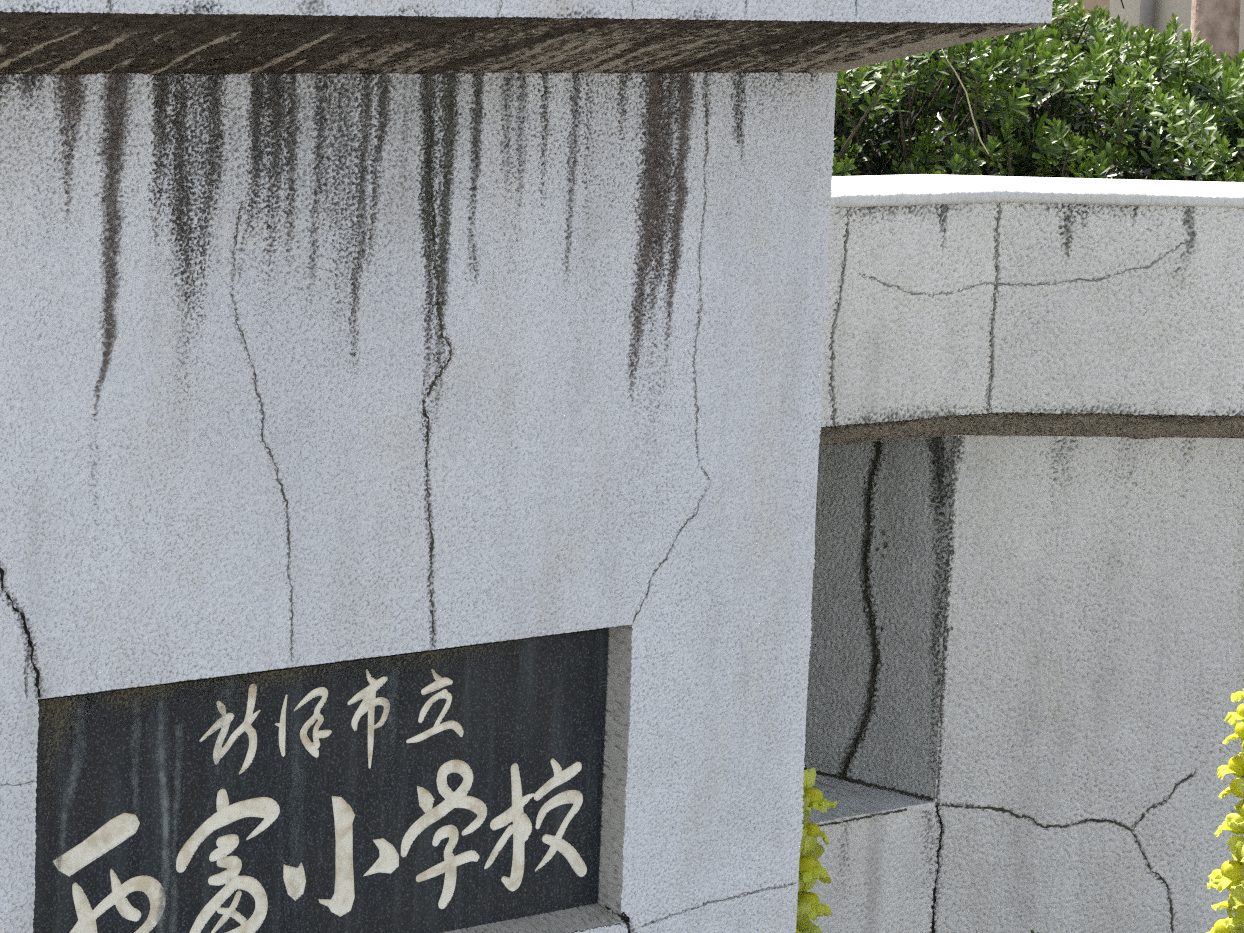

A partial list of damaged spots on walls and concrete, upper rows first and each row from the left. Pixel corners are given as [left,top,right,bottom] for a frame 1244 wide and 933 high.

crack [0,568,42,698]
crack [230,203,293,659]
crack [422,109,454,647]
water stain [0,0,1034,405]
crack [633,95,711,623]
crack [569,883,795,933]
crack [804,439,1194,933]
crack [829,202,1196,425]